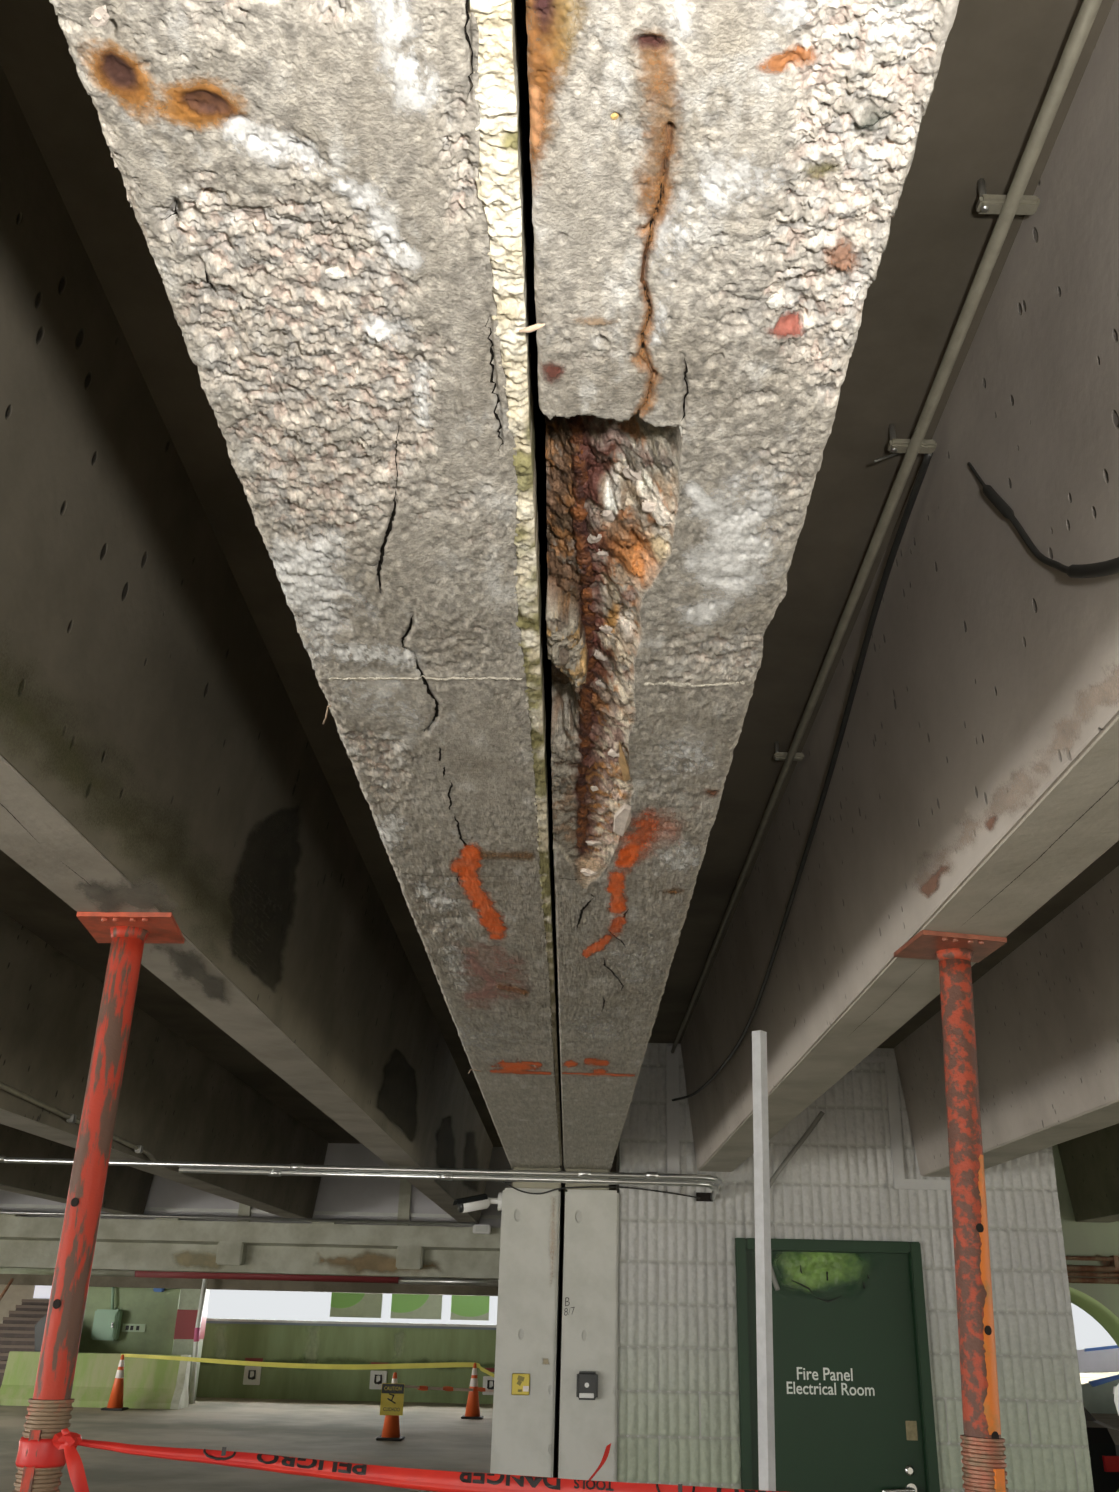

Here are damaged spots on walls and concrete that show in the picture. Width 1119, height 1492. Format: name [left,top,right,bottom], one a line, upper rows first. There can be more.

corrosion [89,49,242,128]
corrosion [526,0,580,176]
corrosion [633,35,675,416]
crack [640,158,689,421]
crack [370,417,400,593]
spalling [545,411,683,888]
water stain [230,807,301,991]
crack [401,615,629,1012]
water stain [377,1049,417,1141]
water stain [436,1117,478,1190]